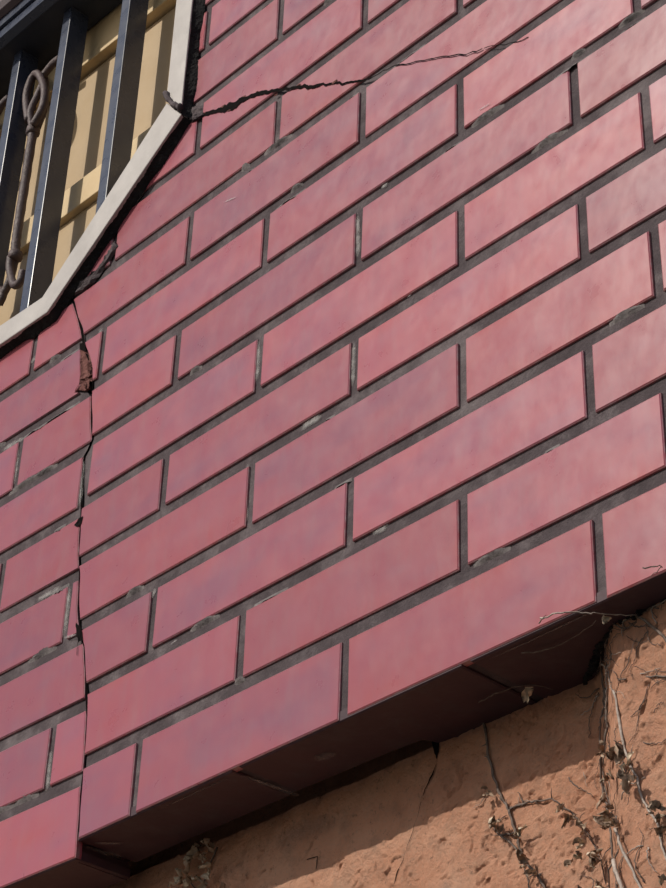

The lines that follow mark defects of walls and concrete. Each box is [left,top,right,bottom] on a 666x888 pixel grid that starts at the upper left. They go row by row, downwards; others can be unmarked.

crack [190,37,528,123]
crack [71,299,94,732]
crack [78,756,87,833]
crack [394,742,439,883]